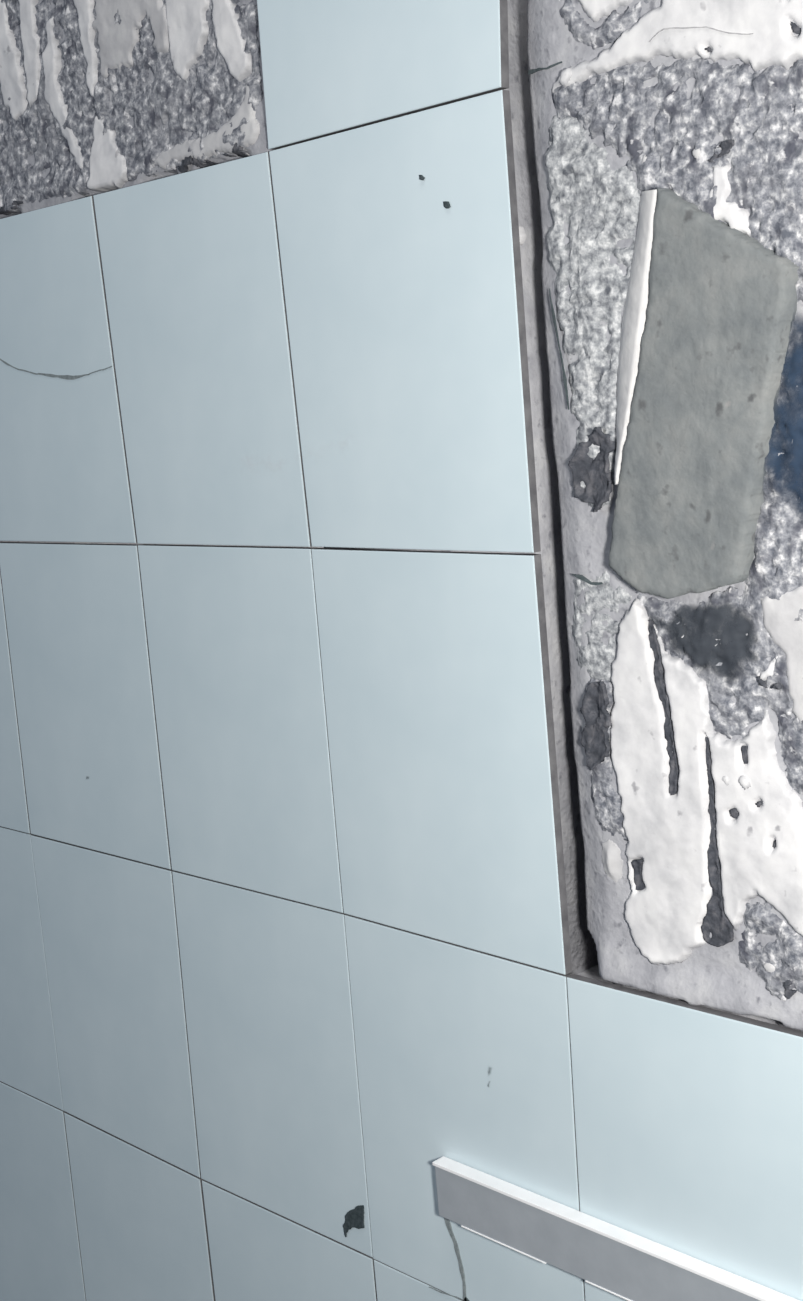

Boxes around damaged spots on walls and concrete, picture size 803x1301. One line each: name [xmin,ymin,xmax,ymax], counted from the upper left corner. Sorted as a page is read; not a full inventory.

spalling [0,0,263,216]
spalling [545,0,803,512]
crack [0,359,112,380]
peeling [572,453,803,1001]
peeling [343,1205,364,1237]
crack [429,1218,469,1301]